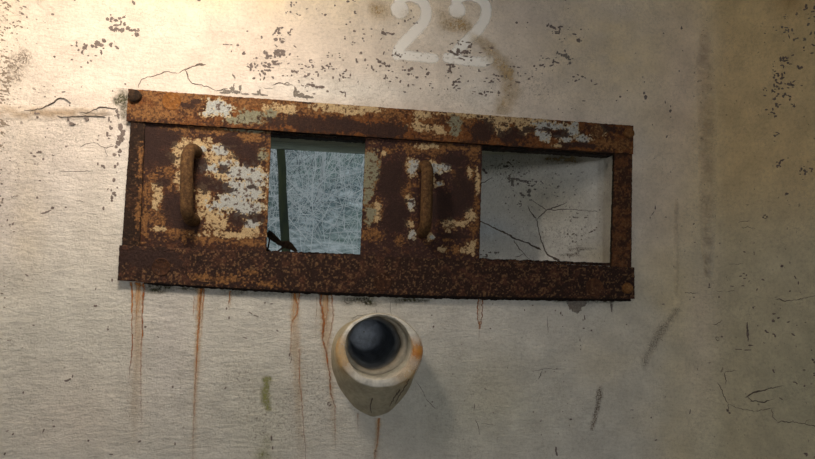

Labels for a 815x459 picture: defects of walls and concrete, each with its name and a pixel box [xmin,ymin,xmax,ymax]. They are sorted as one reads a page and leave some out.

peeling [0,0,28,105]
crack [24,97,116,118]
peeling [71,38,119,68]
peeling [106,14,140,37]
crack [138,63,228,91]
peeling [219,27,351,99]
peeling [444,40,574,96]
spalling [97,109,126,210]
corrosion [129,282,145,368]
corrosion [193,288,204,379]
corrosion [319,295,348,402]
crack [718,370,815,426]